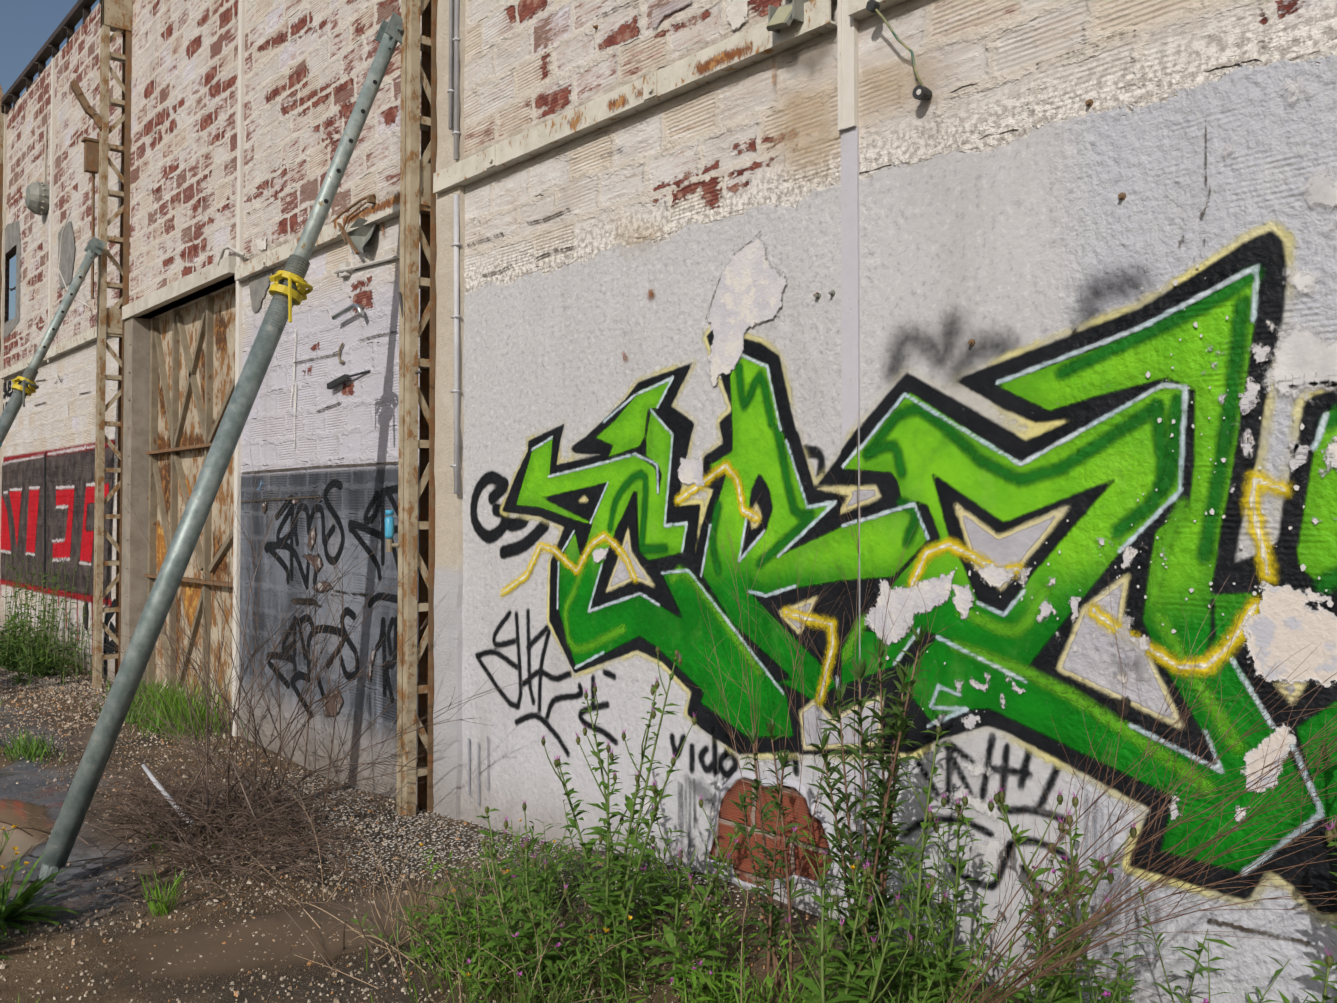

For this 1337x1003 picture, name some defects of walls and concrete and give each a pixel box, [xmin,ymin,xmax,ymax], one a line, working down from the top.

peeling [504,0,548,23]
peeling [594,0,712,52]
peeling [266,65,356,149]
peeling [147,163,298,278]
peeling [653,126,809,209]
peeling [707,236,787,386]
rust [156,311,230,572]
rust [176,530,230,670]
peeling [863,542,1095,660]
peeling [1227,564,1337,687]
flaking render [704,770,839,894]
peeling [1234,723,1296,830]